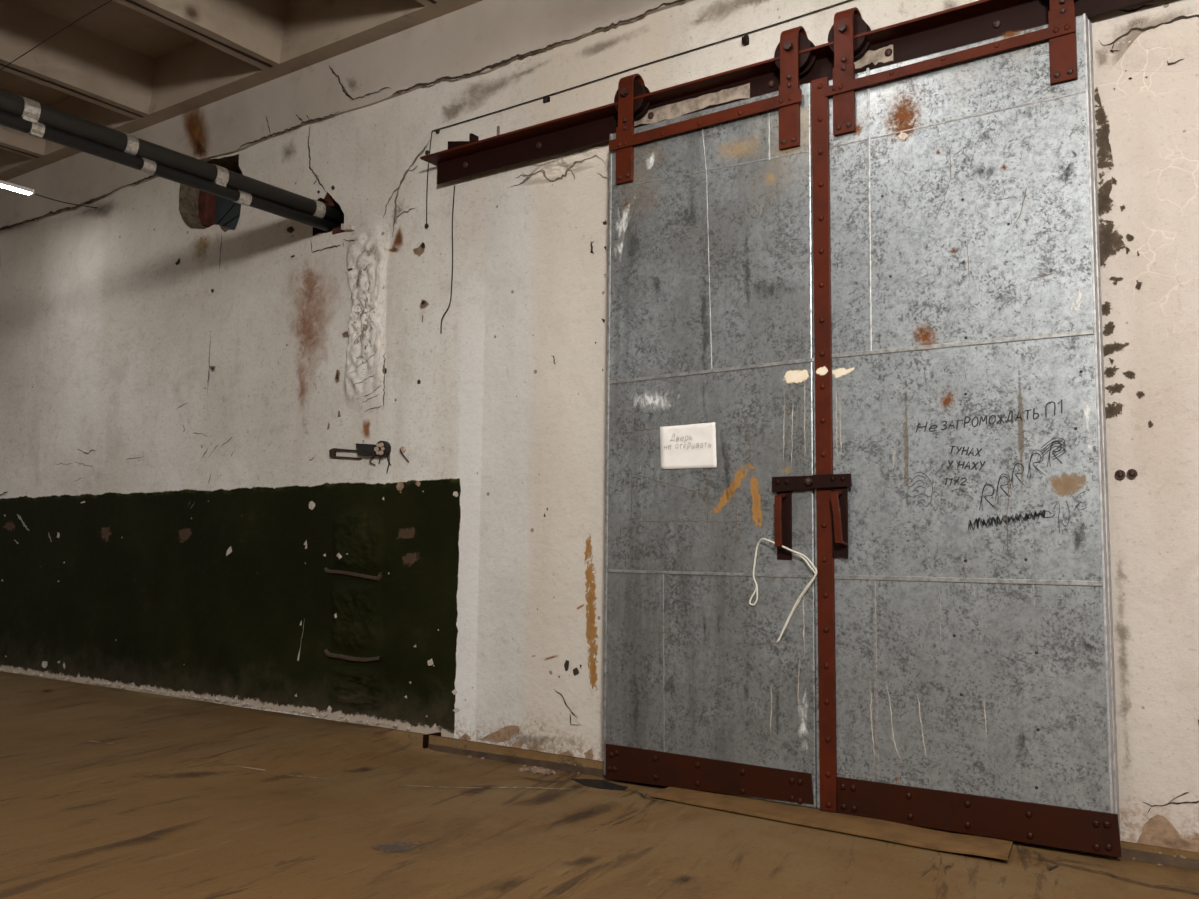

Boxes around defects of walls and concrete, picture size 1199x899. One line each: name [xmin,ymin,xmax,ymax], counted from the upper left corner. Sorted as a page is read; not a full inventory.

crack [1100,5,1199,51]
corrosion [185,110,206,156]
crack [240,0,685,192]
corrosion [887,96,916,136]
spalling [206,154,243,175]
spalling [179,184,241,232]
flaking render [1094,88,1142,290]
flaking render [1102,301,1145,419]
crack [1143,792,1199,814]